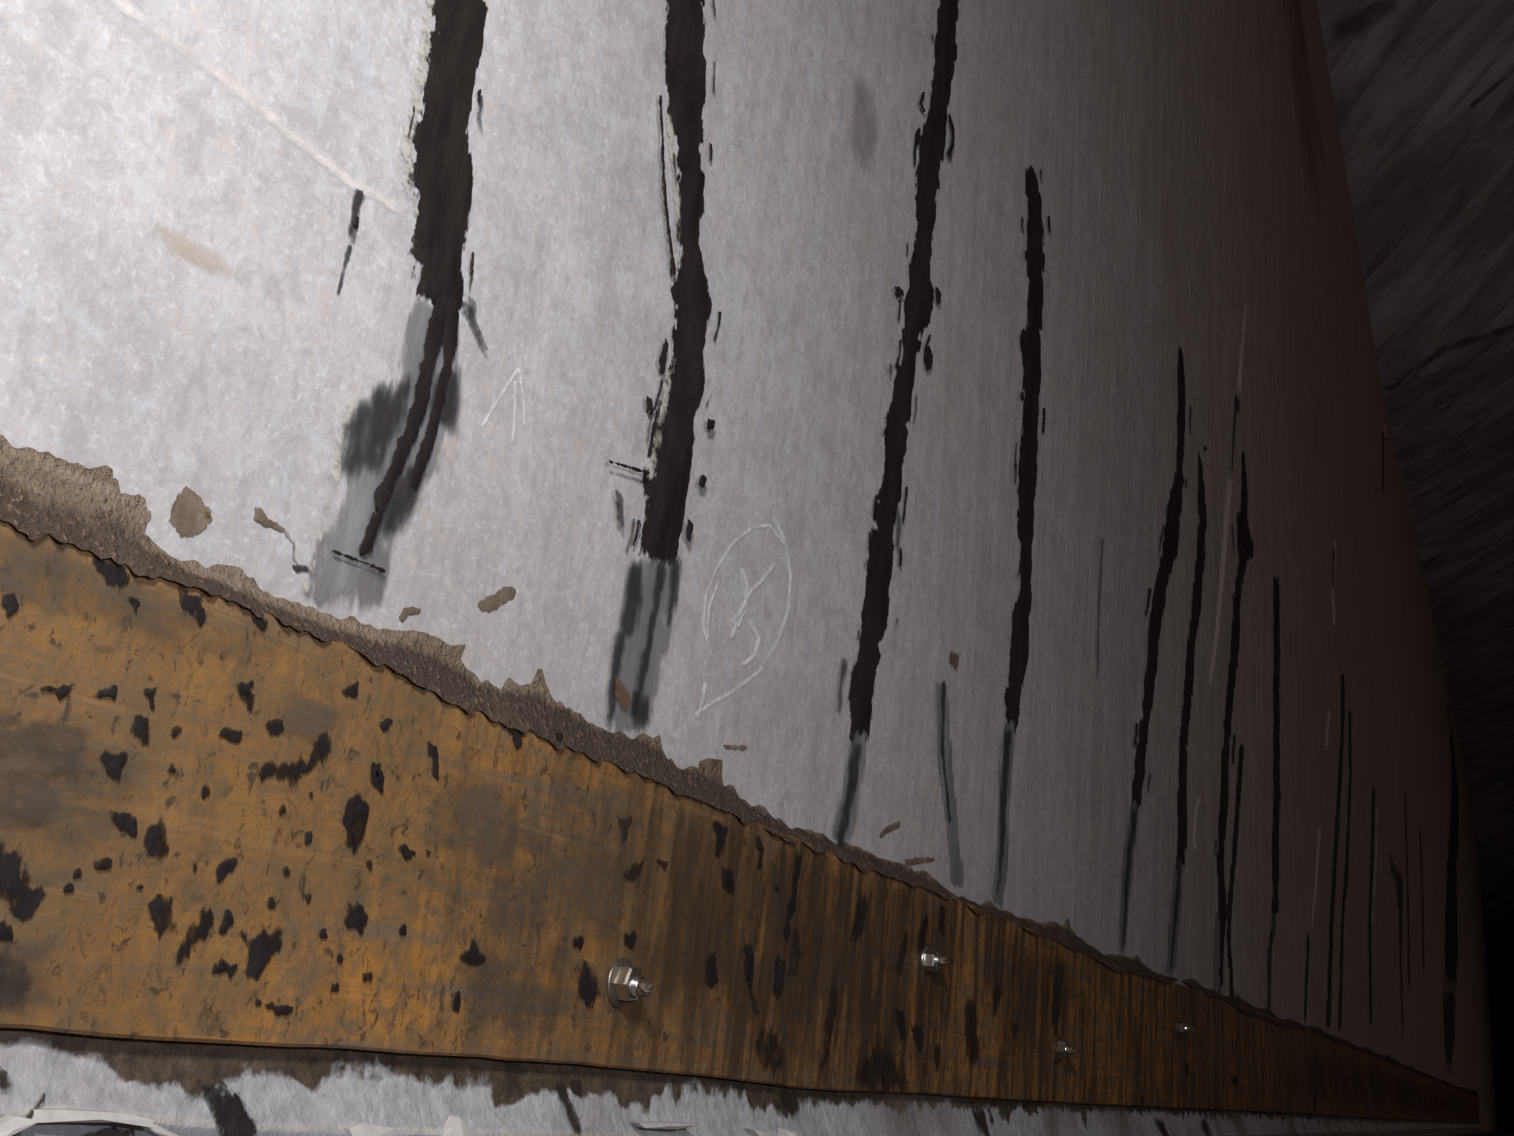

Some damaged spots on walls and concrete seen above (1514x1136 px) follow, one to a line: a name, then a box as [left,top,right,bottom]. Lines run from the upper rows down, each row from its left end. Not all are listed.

peeling [169,486,213,537]
peeling [254,507,310,573]
peeling [399,606,421,622]
peeling [478,586,516,613]
peeling [238,680,255,711]
peeling [219,727,243,743]
peeling [100,750,128,783]
peeling [371,762,385,794]
peeling [110,810,169,858]
peeling [64,857,113,893]
peeling [216,857,238,882]
peeling [0,1108,178,1136]